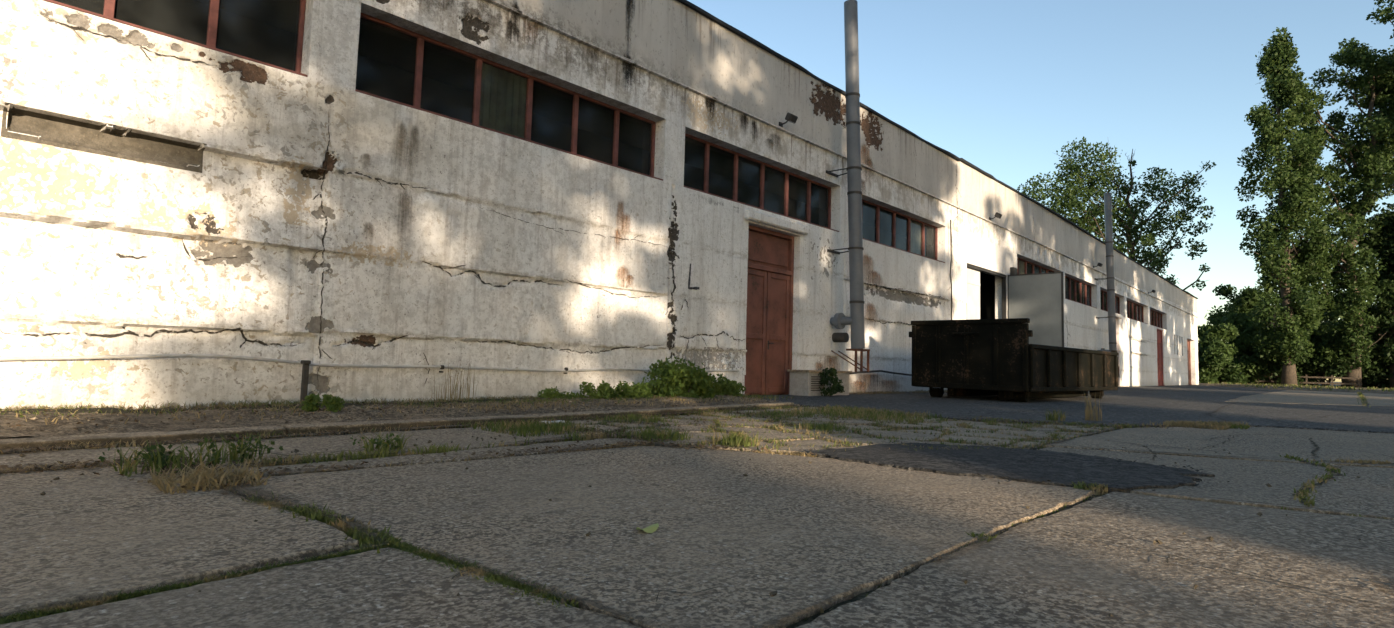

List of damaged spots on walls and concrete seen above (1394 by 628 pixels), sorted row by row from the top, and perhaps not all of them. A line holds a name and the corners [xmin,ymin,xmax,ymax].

spalling [40,9,269,85]
spalling [0,47,207,220]
peeling [137,188,254,307]
crack [0,111,430,383]
peeling [283,152,338,226]
crack [422,195,745,359]
spalling [809,81,884,151]
crack [1114,402,1394,508]